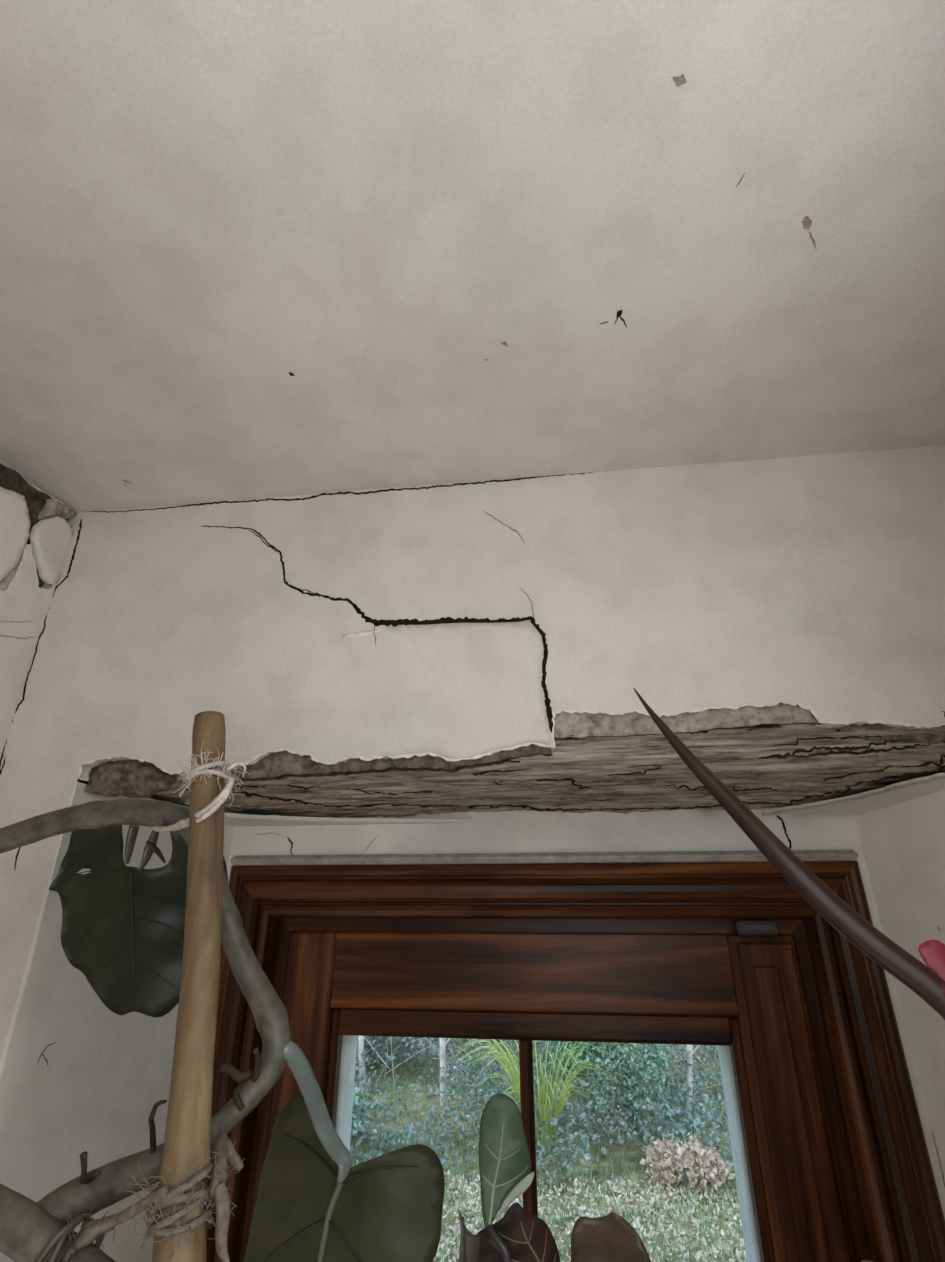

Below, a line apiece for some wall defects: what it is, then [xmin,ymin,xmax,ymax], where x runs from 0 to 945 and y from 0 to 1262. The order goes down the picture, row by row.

spalling [0,460,77,592]
crack [0,472,593,775]
spalling [77,755,190,807]
spalling [224,701,945,817]